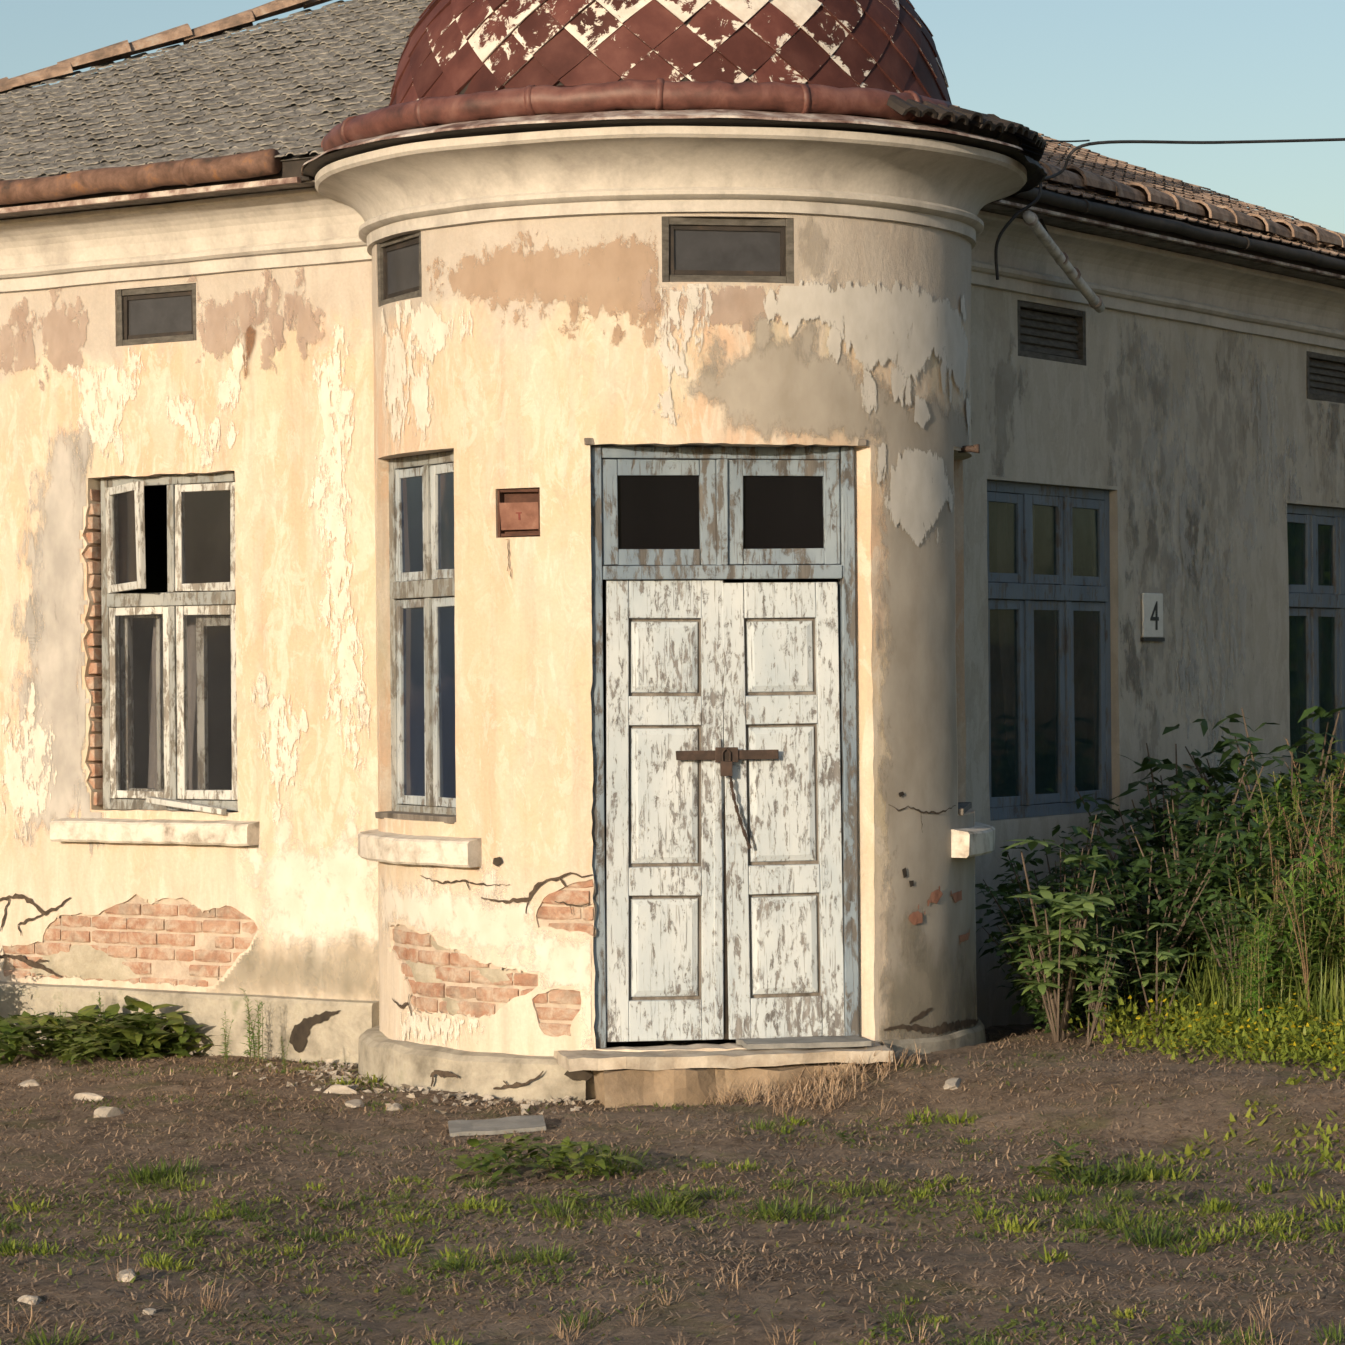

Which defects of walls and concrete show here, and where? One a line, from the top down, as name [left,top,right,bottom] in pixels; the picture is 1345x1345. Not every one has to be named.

crack [0,893,70,977]
flaking render [0,288,145,846]
flaking render [3,895,260,988]
peeling [165,266,372,826]
crack [420,872,593,914]
peeling [380,232,976,1041]